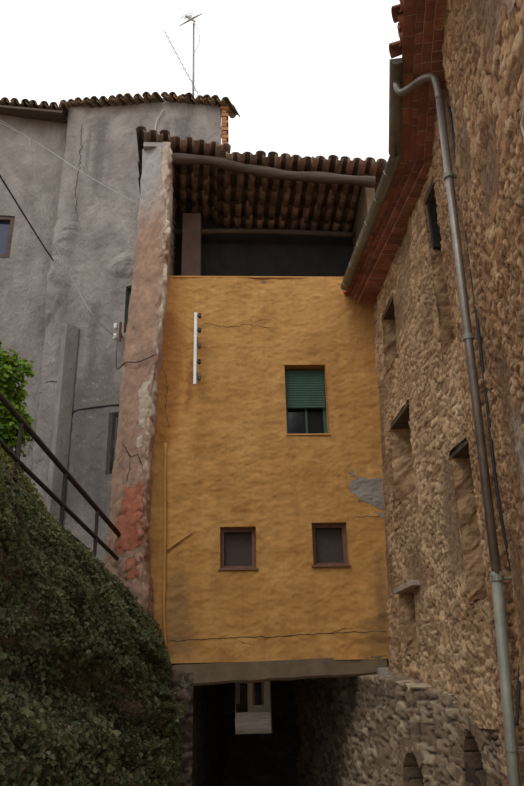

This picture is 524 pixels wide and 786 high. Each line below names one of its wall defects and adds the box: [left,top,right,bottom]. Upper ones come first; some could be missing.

crack [75,127,85,216]
spalling [114,483,147,580]
crack [122,442,143,482]
flaking render [348,471,384,518]